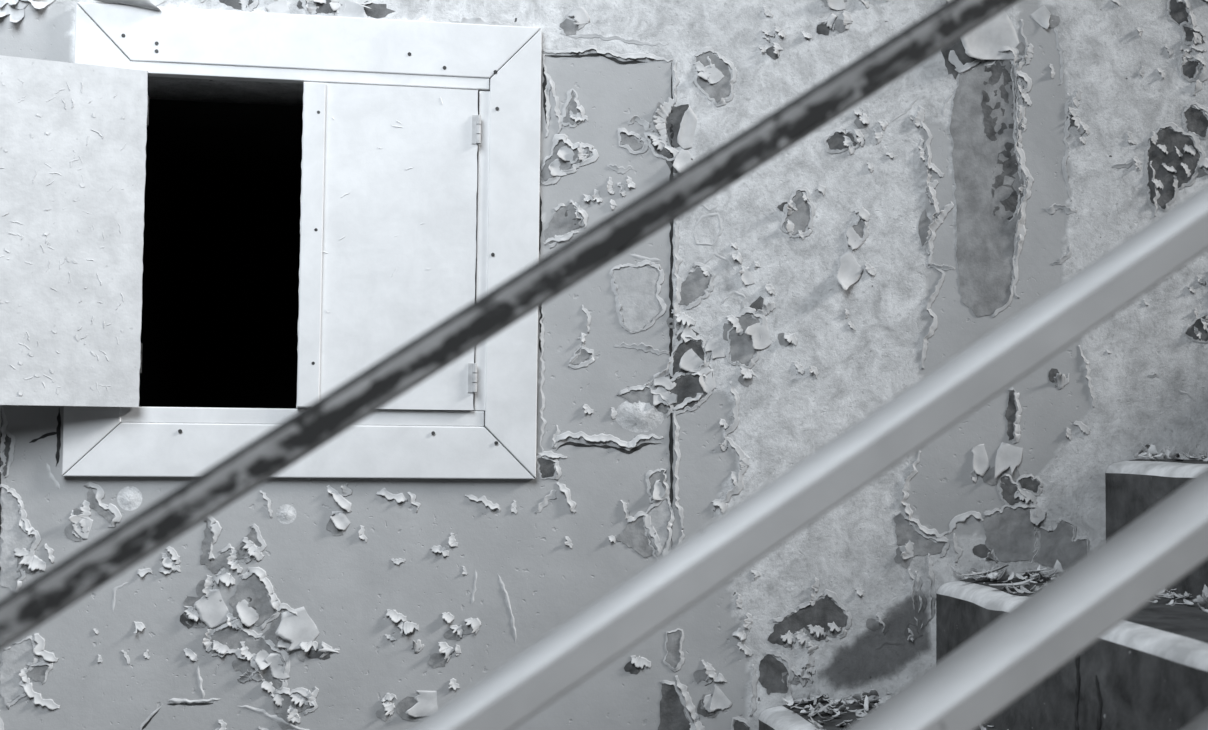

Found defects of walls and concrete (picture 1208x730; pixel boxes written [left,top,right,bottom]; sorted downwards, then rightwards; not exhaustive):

peeling [0,0,55,23]
peeling [539,54,698,252]
spalling [823,6,1090,369]
spalling [1112,0,1208,217]
peeling [610,204,797,515]
peeling [0,430,54,593]
peeling [64,482,143,541]
peeling [893,387,1091,642]
peeling [0,633,60,710]
peeling [180,516,340,730]
peeling [375,609,481,722]
spalling [624,577,886,730]